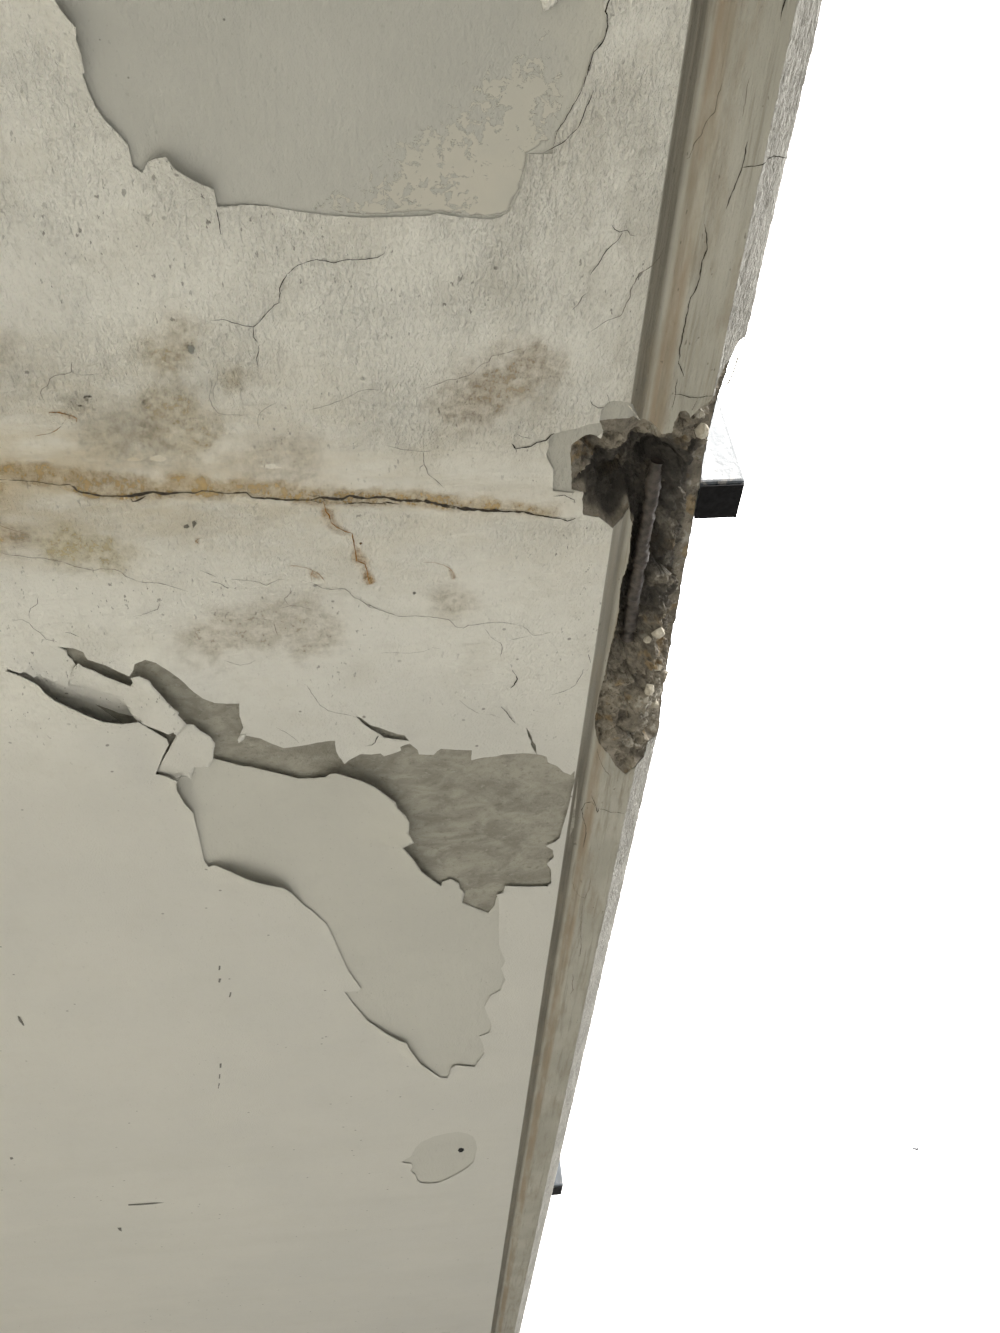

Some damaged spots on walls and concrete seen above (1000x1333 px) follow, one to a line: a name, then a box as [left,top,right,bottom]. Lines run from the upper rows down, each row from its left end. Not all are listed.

peeling [0,0,630,230]
crack [546,0,610,152]
crack [214,248,386,365]
crack [572,226,664,331]
crack [672,81,787,410]
damp [464,346,536,419]
damp [0,464,500,510]
crack [0,445,576,521]
crack [511,434,553,452]
spalling [530,361,729,774]
peeling [0,626,578,1080]
peeling [395,1132,480,1186]